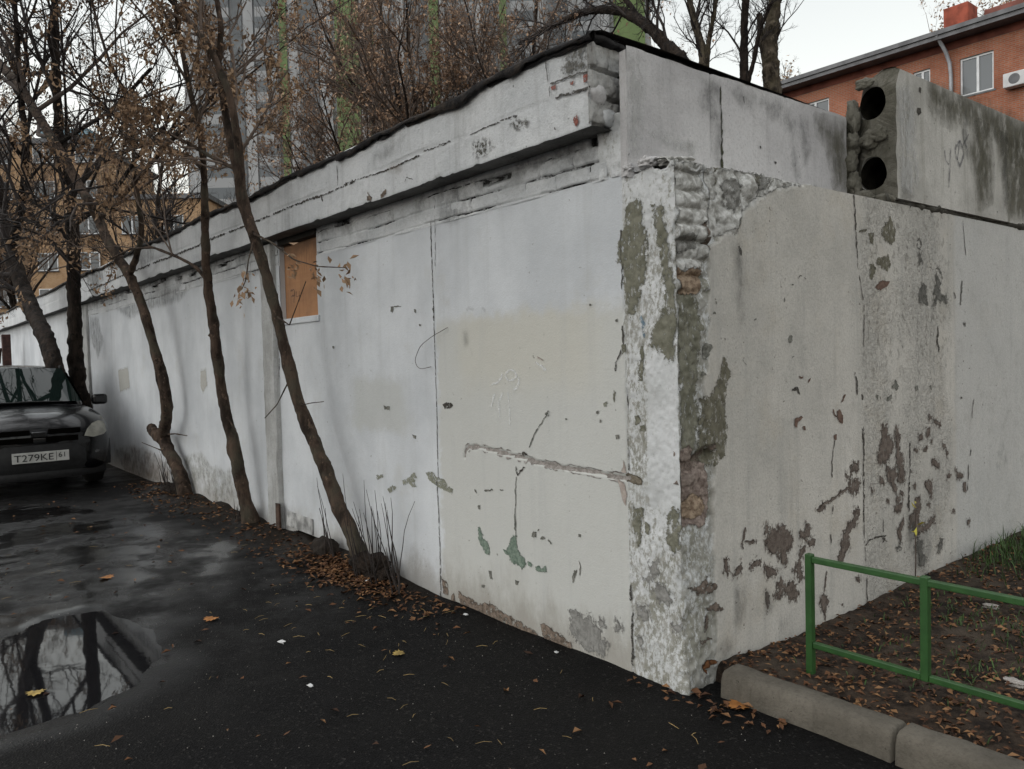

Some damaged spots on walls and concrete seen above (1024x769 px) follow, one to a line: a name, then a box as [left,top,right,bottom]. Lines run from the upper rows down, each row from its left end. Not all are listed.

spalling [845,77,896,202]
damp [932,87,1024,215]
peeling [859,216,896,290]
peeling [918,268,963,309]
peeling [637,346,645,381]
peeling [376,472,453,493]
peeling [478,527,490,555]
peeling [503,535,547,585]
peeling [618,460,650,547]
spalling [665,442,716,555]
peeling [687,414,967,632]
peeling [442,579,624,657]